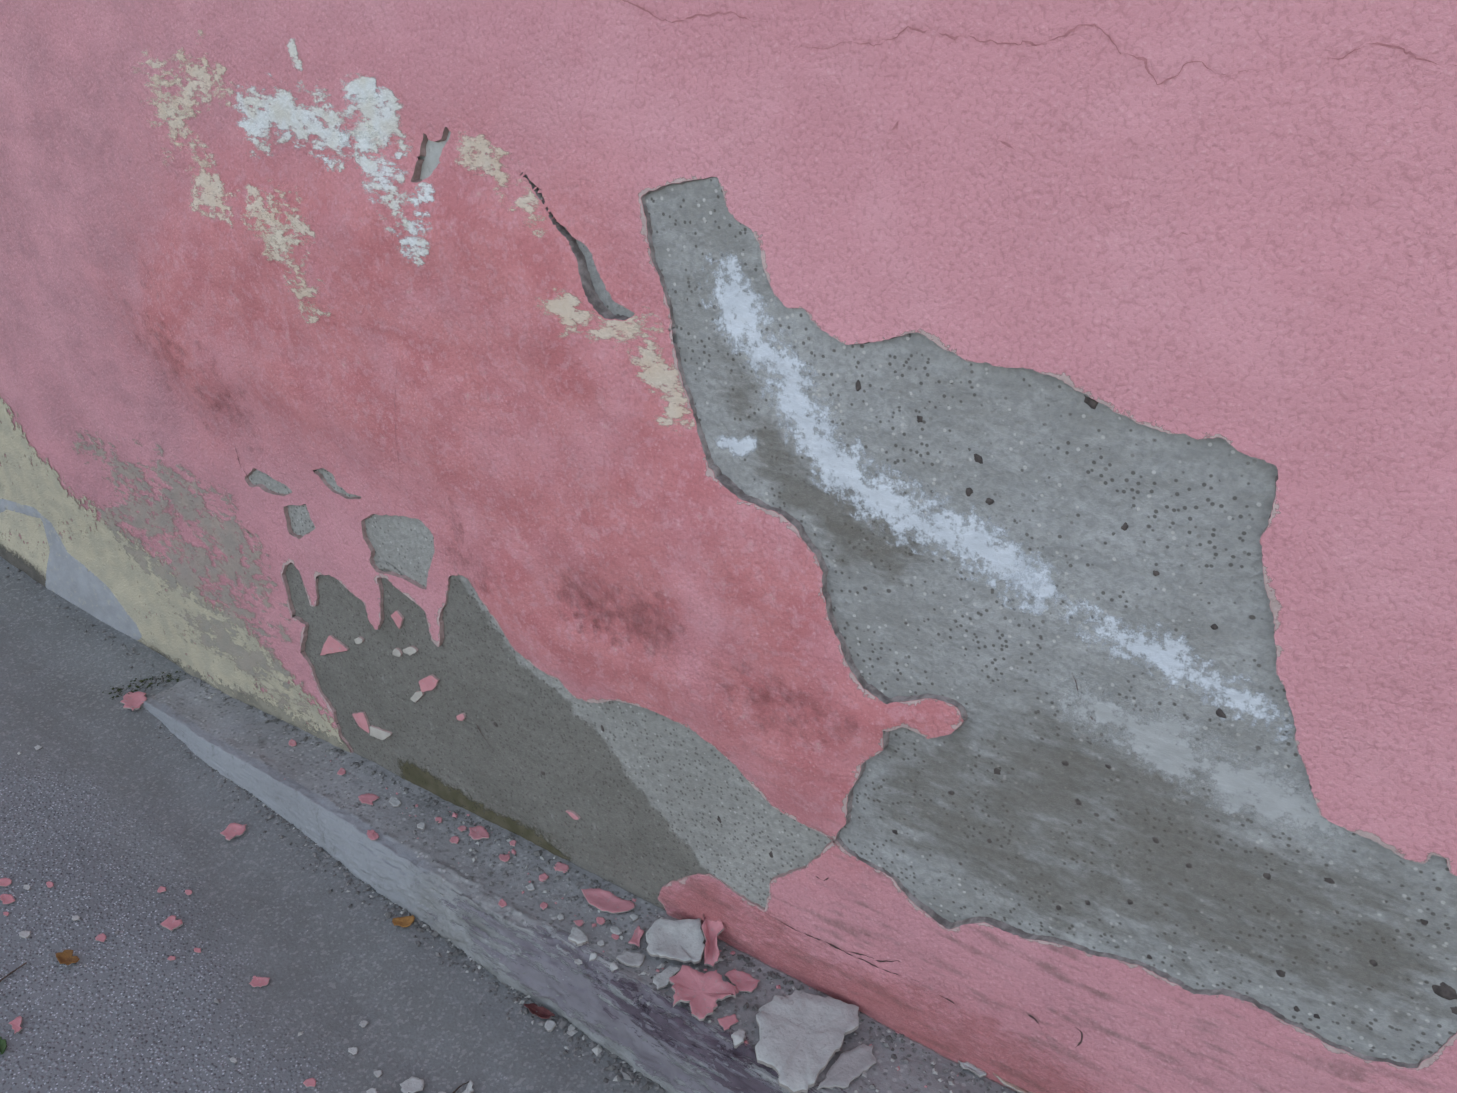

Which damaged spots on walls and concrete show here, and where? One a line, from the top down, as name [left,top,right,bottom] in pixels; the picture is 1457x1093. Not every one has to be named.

crack [623,0,764,23]
crack [793,24,1282,85]
crack [1321,42,1457,67]
peeling [142,38,544,323]
peeling [543,293,593,336]
crack [520,172,635,320]
water stain [702,253,1292,741]
flaking render [0,398,835,912]
flaking render [581,176,1457,1070]
water stain [1060,682,1350,837]
peeling [442,894,859,1093]
flaking render [958,1060,1033,1093]